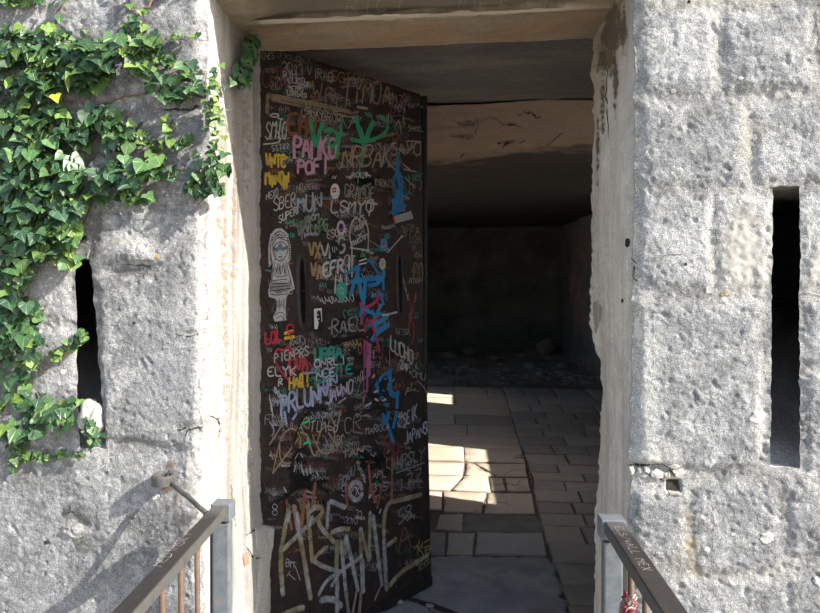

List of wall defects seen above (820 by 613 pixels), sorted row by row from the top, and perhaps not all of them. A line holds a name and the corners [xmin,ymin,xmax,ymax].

leakage [596,4,626,170]
crack [469,454,534,512]
peeling [664,464,685,479]